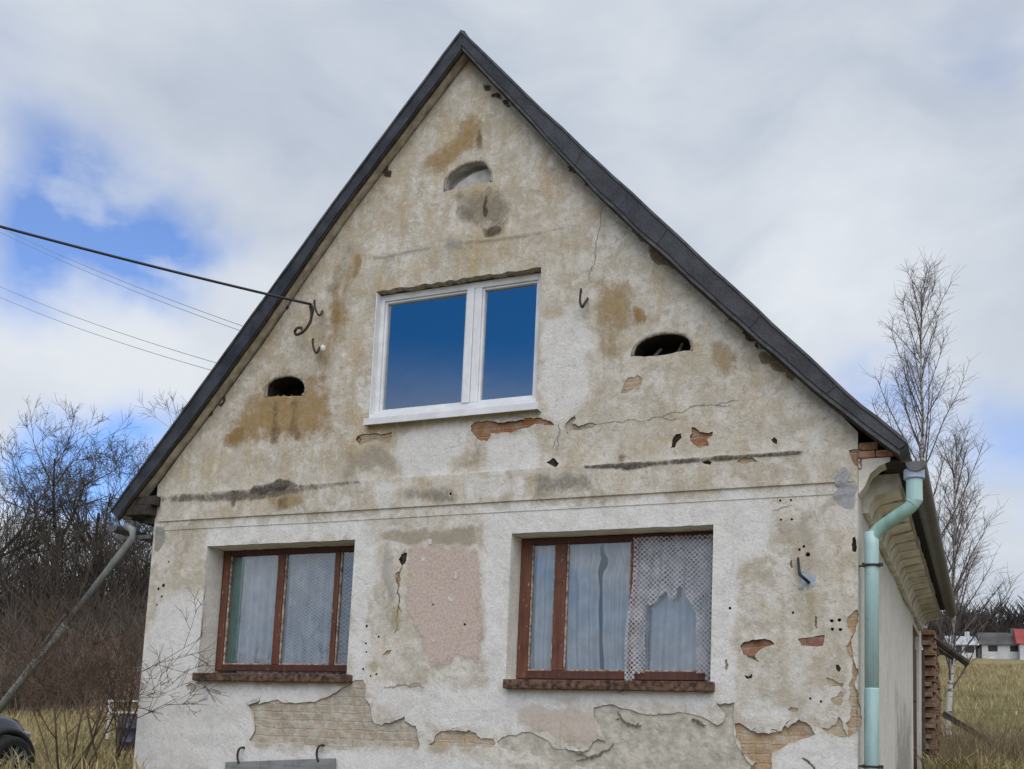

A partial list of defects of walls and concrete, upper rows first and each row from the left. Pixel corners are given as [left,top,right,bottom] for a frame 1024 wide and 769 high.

damp [459,193,506,237]
spalling [621,375,642,393]
spalling [356,432,392,445]
spalling [471,416,597,441]
crack [597,400,738,424]
spalling [671,427,713,448]
damp [172,449,392,509]
damp [538,451,800,492]
crack [394,551,405,633]
peeling [384,527,483,667]
spalling [246,610,862,769]